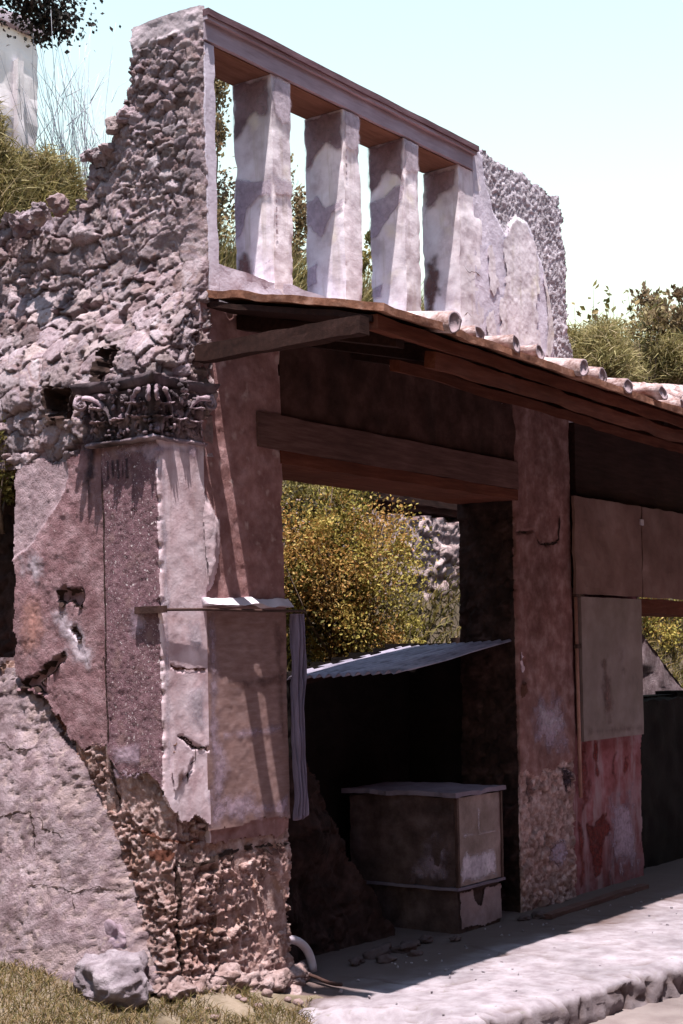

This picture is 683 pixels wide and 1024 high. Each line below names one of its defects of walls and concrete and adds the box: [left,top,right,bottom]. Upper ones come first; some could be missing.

flaking render [56,588,85,608]
flaking render [10,651,67,693]
flaking render [115,745,139,778]
crack [171,736,205,790]
flaking render [562,768,574,791]
crack [0,811,66,844]
spalling [149,848,175,863]
spalling [207,848,291,961]